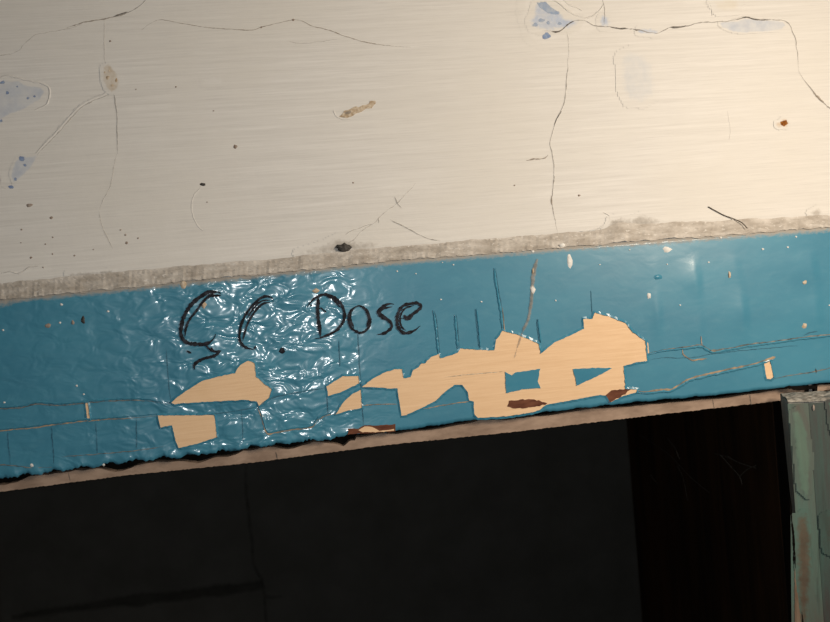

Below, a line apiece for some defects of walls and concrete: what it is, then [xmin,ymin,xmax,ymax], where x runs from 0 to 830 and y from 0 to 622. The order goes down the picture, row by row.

crack [67,2,144,28]
crack [552,3,830,108]
crack [526,56,569,228]
peeling [156,359,274,450]
peeling [324,311,649,434]